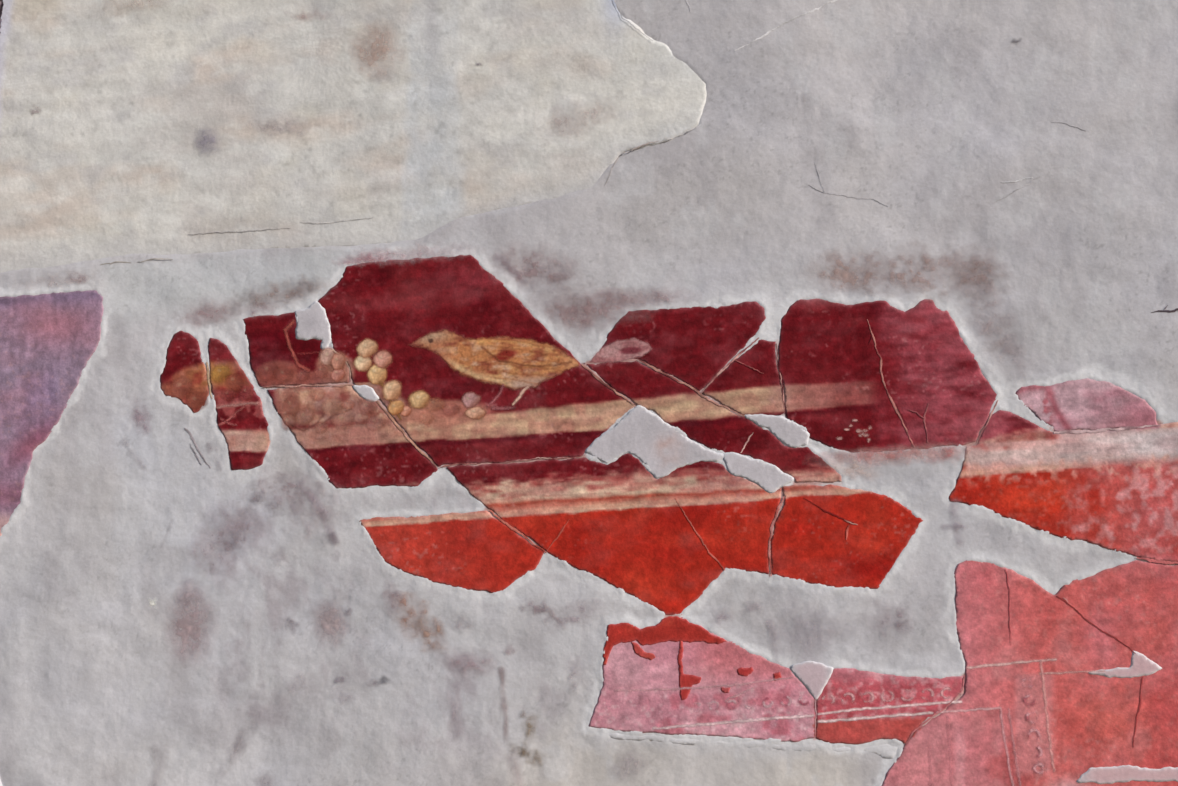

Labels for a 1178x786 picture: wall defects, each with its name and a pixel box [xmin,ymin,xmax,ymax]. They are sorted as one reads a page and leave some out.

flaking render [295,301,331,350]
flaking render [352,385,379,402]
crack [377,401,586,468]
crack [582,364,636,406]
flaking render [585,405,794,493]
crack [637,337,786,453]
flaking render [744,414,810,448]
crack [867,319,929,449]
crack [489,510,569,553]
crack [675,498,725,570]
crack [768,496,858,576]
crack [1057,596,1143,748]